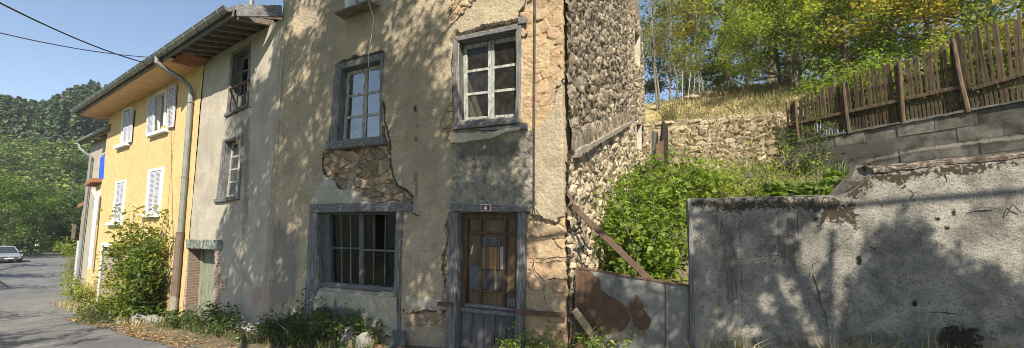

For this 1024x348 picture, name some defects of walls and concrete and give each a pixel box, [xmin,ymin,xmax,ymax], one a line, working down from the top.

flaking render [520,0,569,130]
flaking render [324,143,414,203]
flaking render [525,213,574,348]
rust [575,269,651,348]
crack [809,229,876,328]